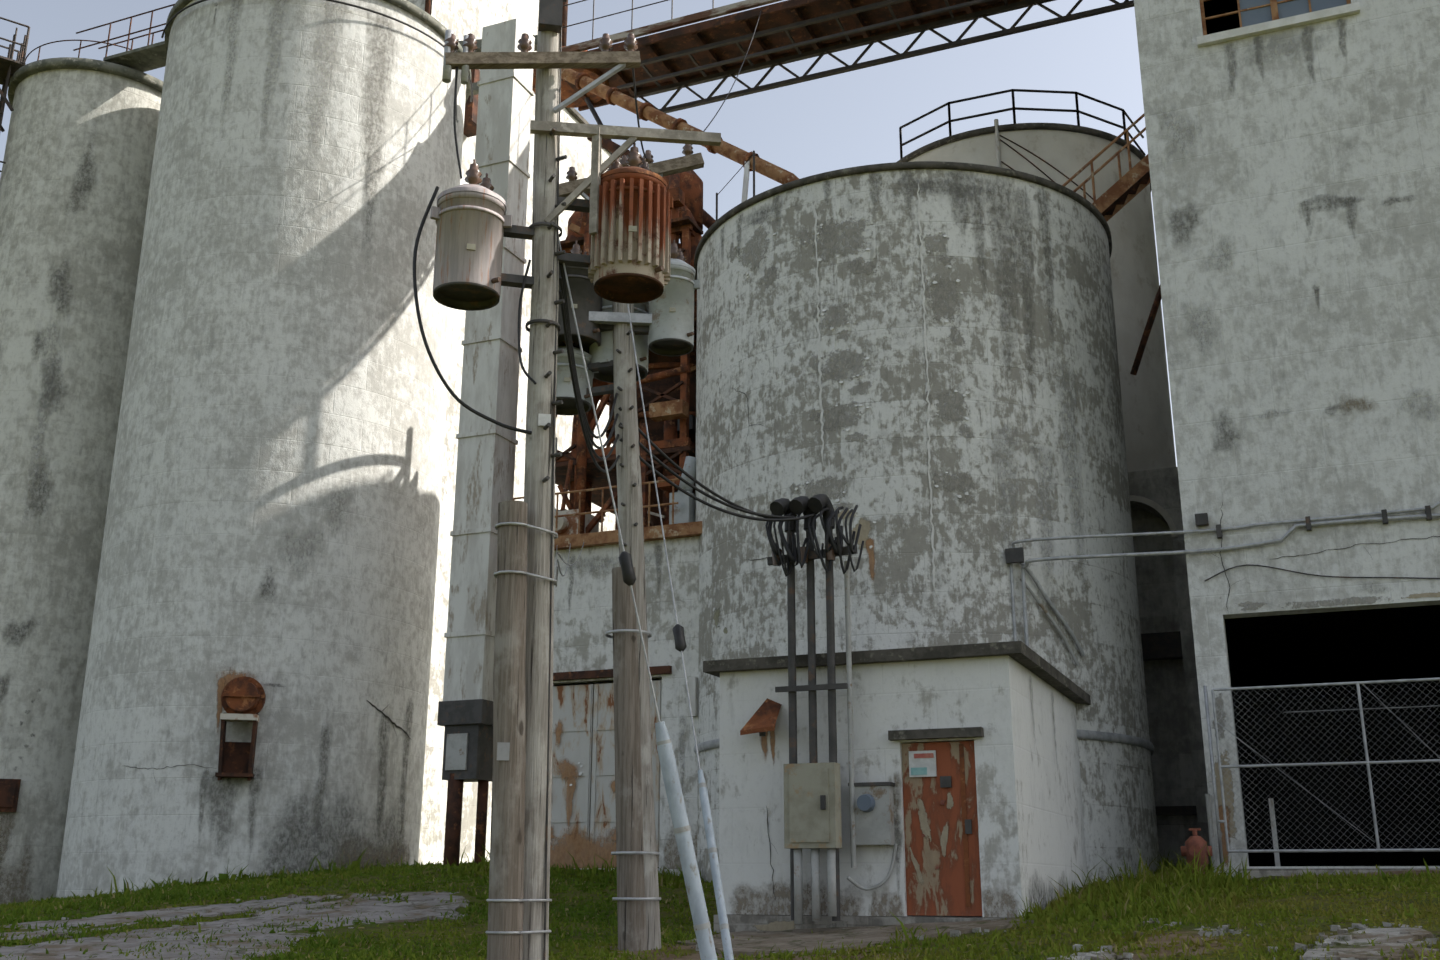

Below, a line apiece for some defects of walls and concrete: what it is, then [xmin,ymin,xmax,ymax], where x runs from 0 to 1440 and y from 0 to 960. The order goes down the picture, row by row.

crack [367,700,412,740]
crack [128,764,216,781]
rust [550,720,617,869]
peeling [909,793,954,885]